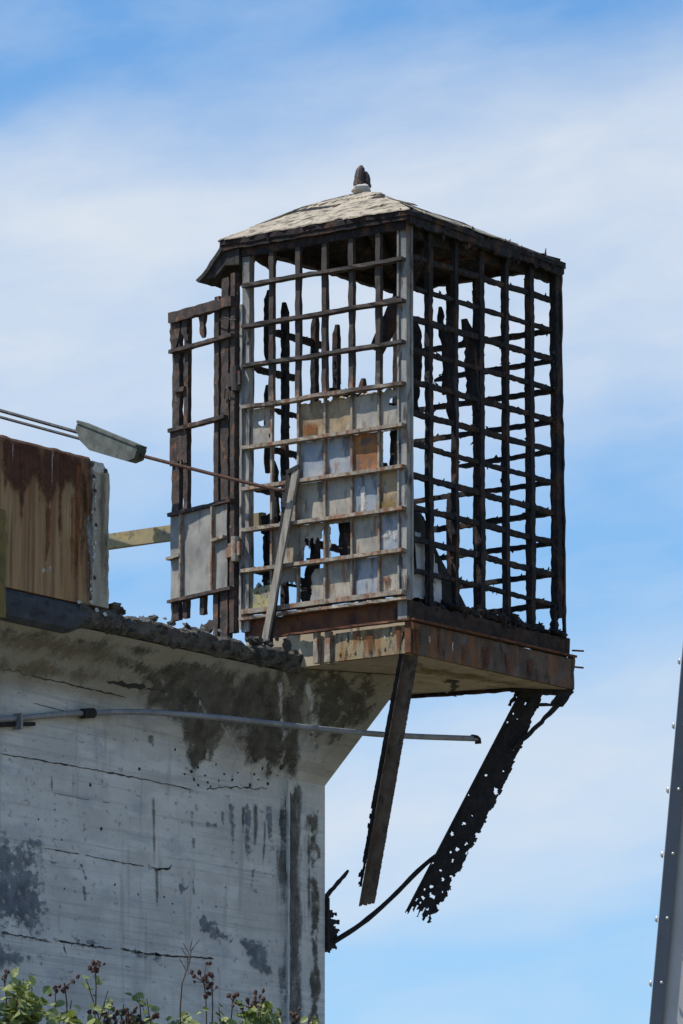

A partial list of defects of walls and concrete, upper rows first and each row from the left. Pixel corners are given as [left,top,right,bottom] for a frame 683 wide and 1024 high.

corrosion [2,440,92,590]
spalling [258,636,298,654]
crack [1,753,268,803]
water stain [135,646,376,1024]
crack [1,931,213,970]